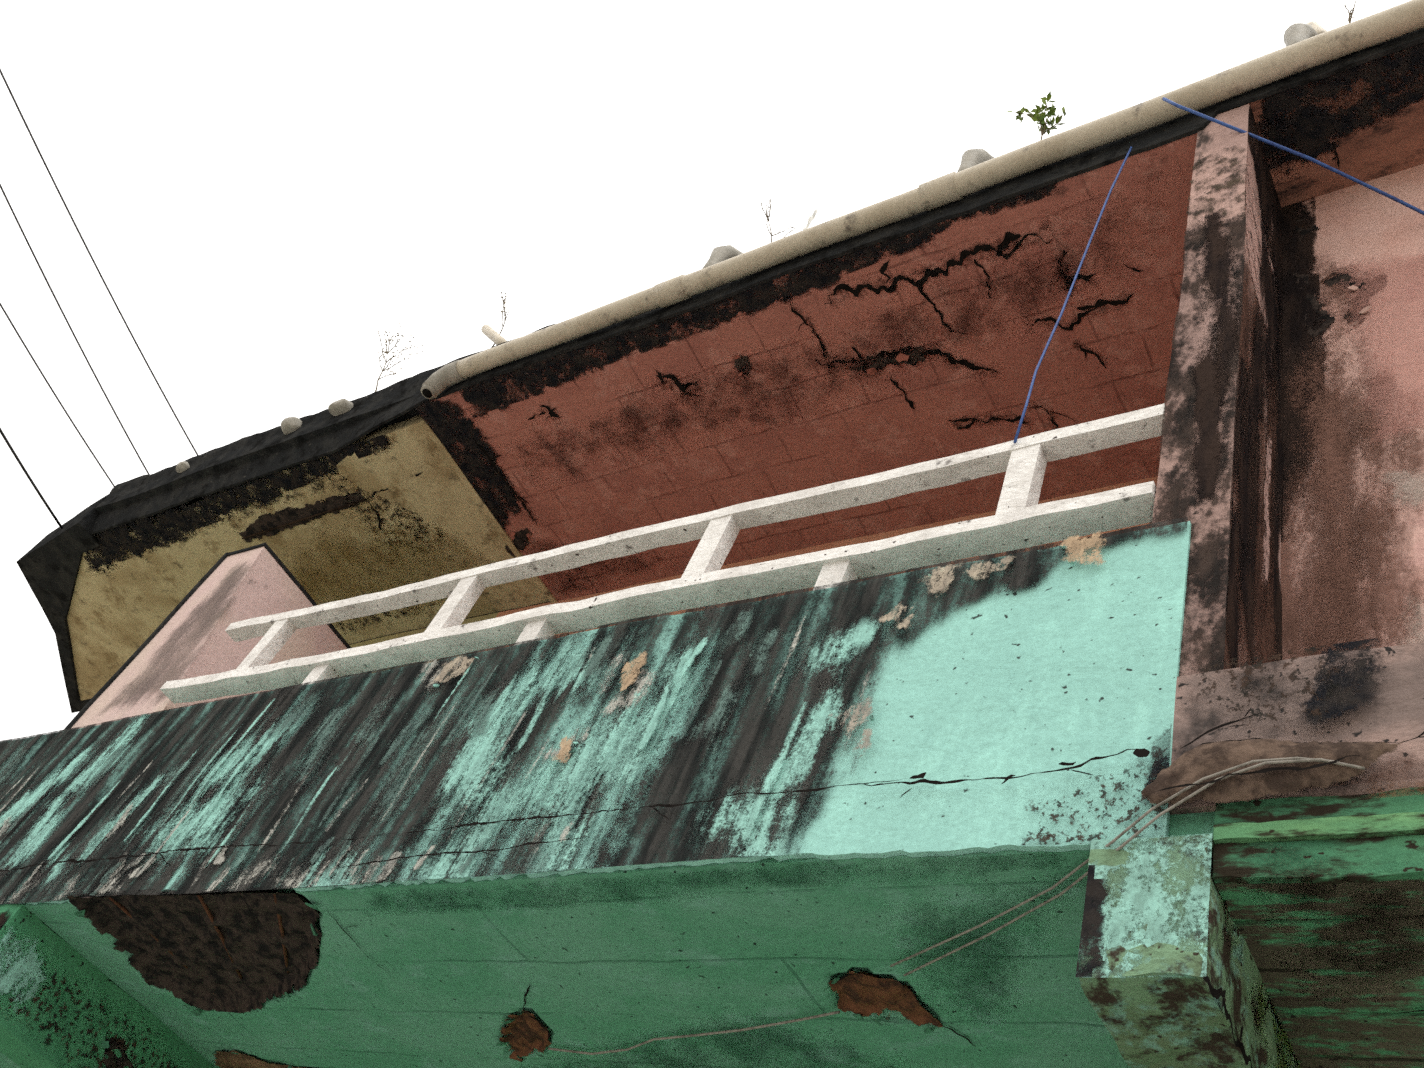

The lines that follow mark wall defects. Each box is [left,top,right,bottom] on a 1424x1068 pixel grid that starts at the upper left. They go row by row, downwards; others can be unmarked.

crack [655,370,702,397]
damp [415,180,1063,532]
crack [789,227,1144,410]
crack [948,406,1078,430]
damp [1078,43,1424,729]
damp [84,434,449,573]
damp [0,541,1070,972]
crack [0,707,1258,872]
damp [1021,723,1172,846]
damp [0,963,178,1068]
spalling [67,890,322,1016]
crack [329,914,390,975]